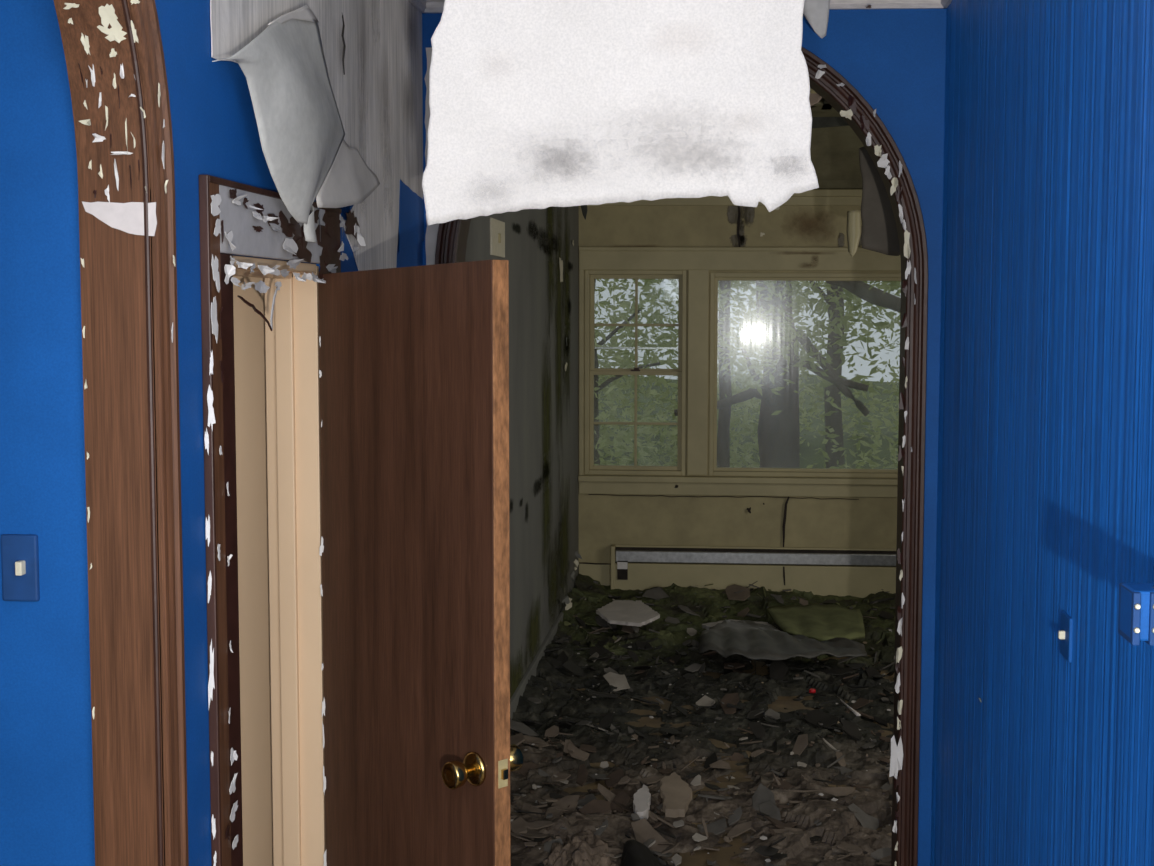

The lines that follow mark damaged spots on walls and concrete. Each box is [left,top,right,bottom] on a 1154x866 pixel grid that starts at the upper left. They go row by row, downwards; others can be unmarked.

peeling [63,3,168,236]
flaking render [204,0,432,455]
flaking render [425,216,439,265]
peeling [836,83,917,475]
damp [510,207,573,621]
peeling [206,516,233,603]
peeling [562,551,582,610]
peeling [212,748,238,866]
peeling [889,533,905,866]